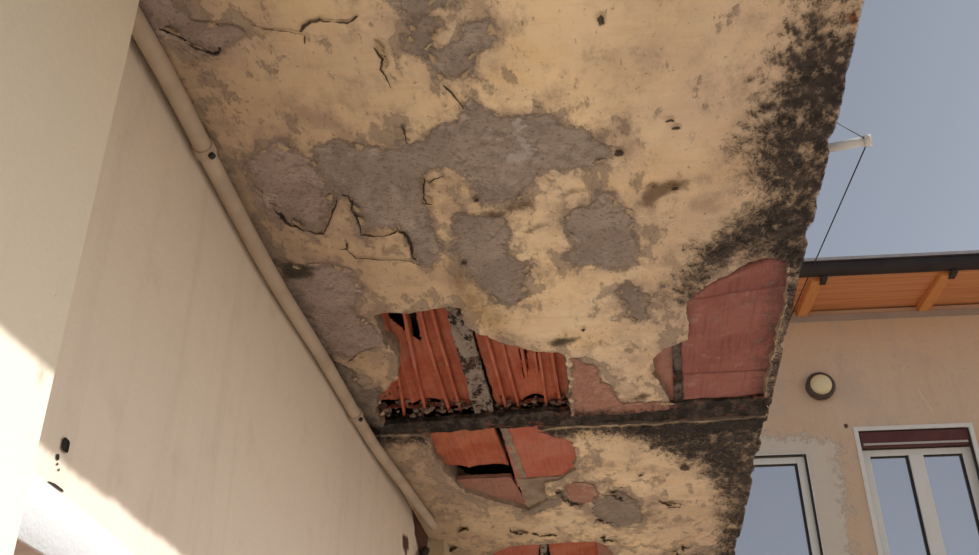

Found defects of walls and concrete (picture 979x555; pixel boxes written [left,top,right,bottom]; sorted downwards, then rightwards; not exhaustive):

crack [159,27,222,55]
peeling [387,0,499,82]
crack [275,194,422,266]
peeling [242,96,624,307]
peeling [559,190,651,322]
damp [539,0,863,555]
spalling [273,258,797,528]
damp [369,420,427,449]
spalling [492,541,613,555]